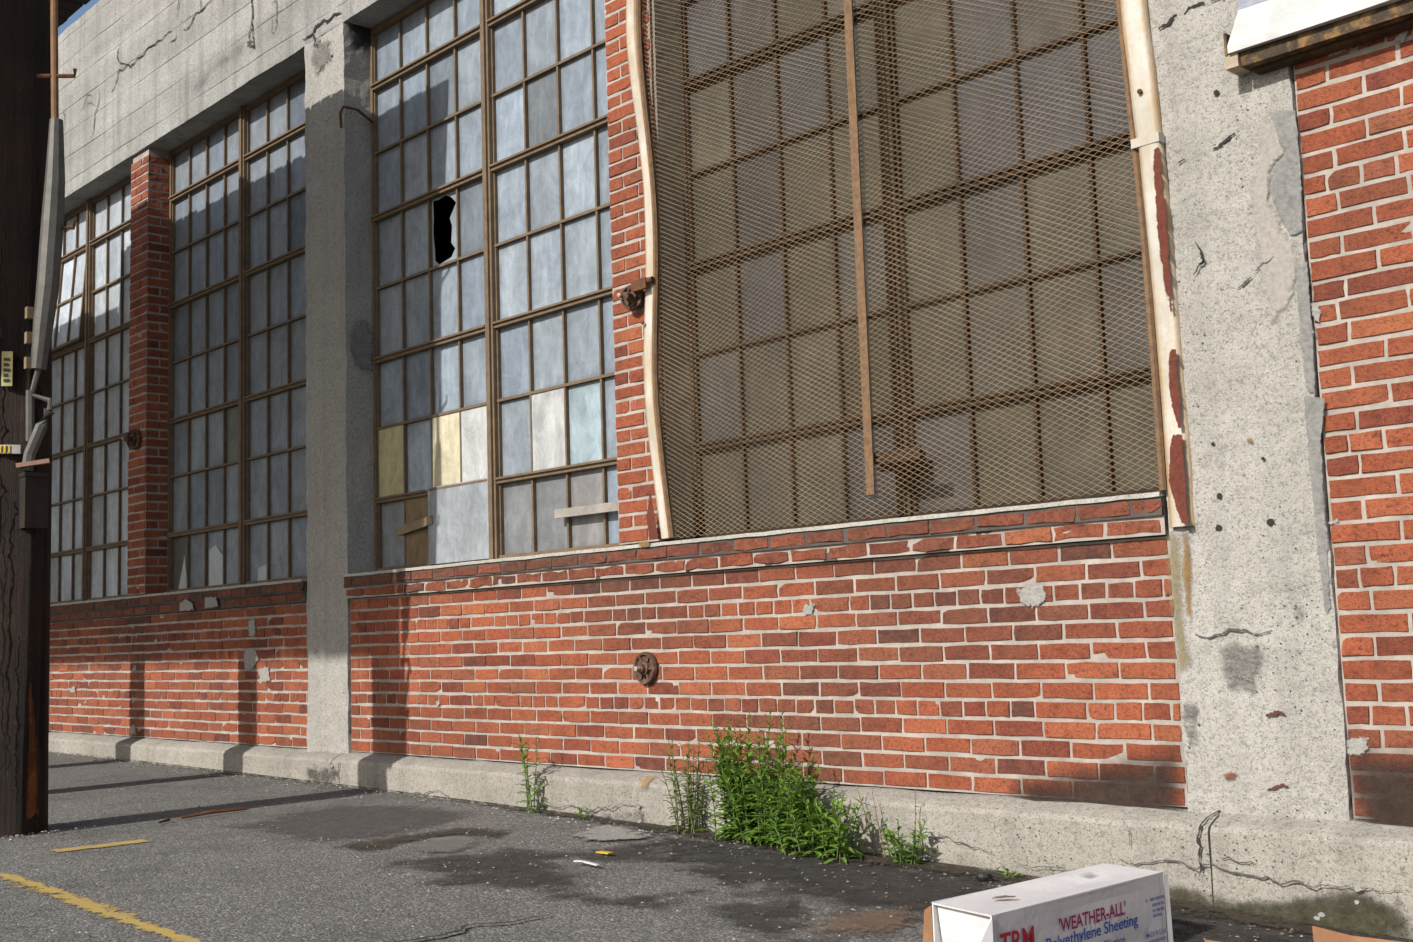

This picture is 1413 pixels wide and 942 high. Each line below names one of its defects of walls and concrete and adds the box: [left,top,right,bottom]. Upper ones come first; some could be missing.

crack [1158,0,1215,29]
crack [63,0,341,133]
crack [1195,628,1270,639]
damp [1352,755,1413,827]
crack [908,828,1076,871]
crack [1119,810,1400,892]